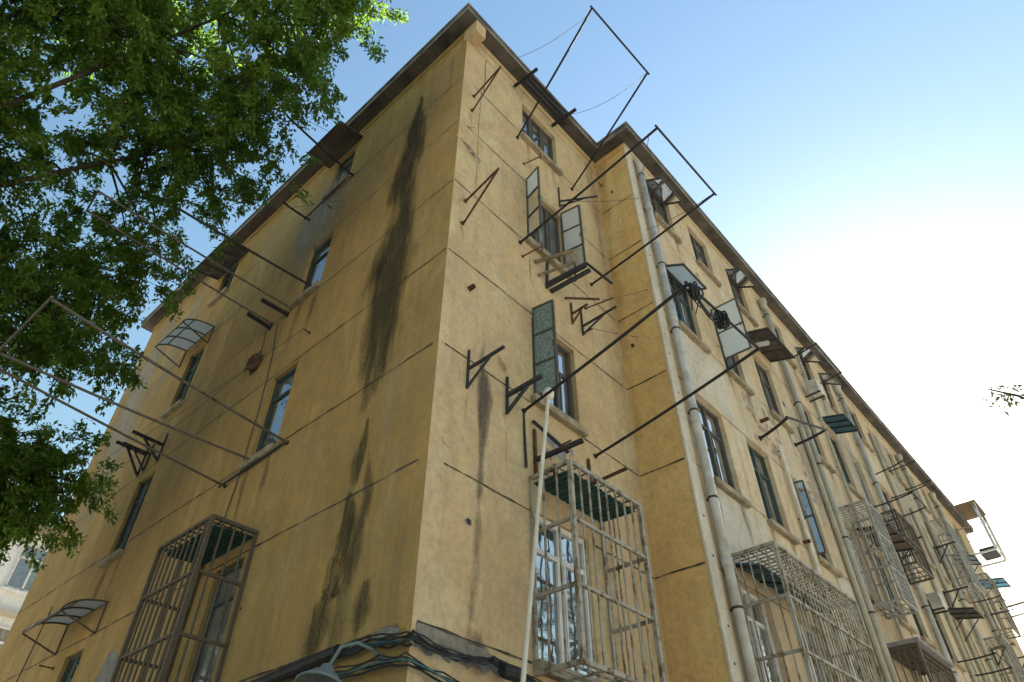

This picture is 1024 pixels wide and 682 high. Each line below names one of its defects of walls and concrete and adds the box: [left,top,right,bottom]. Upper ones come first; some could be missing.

water stain [360,97,425,401]
water stain [304,419,372,657]
water stain [478,370,491,484]